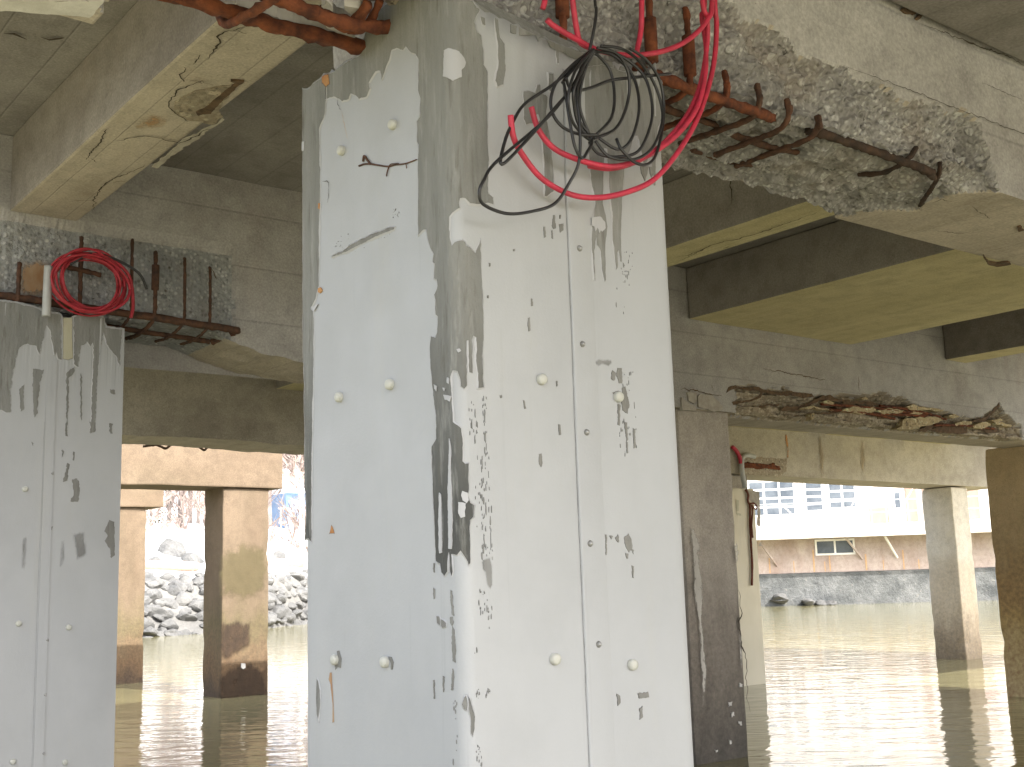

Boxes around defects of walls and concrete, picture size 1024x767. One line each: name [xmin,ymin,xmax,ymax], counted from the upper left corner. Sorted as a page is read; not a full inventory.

spalling [0,0,104,18]
crack [80,28,247,210]
spalling [0,220,241,436]
spalling [152,0,1022,629]
peeling [61,450,80,502]
peeling [104,520,115,558]
damp [222,622,250,657]
damp [220,664,265,698]
peeling [433,590,490,767]